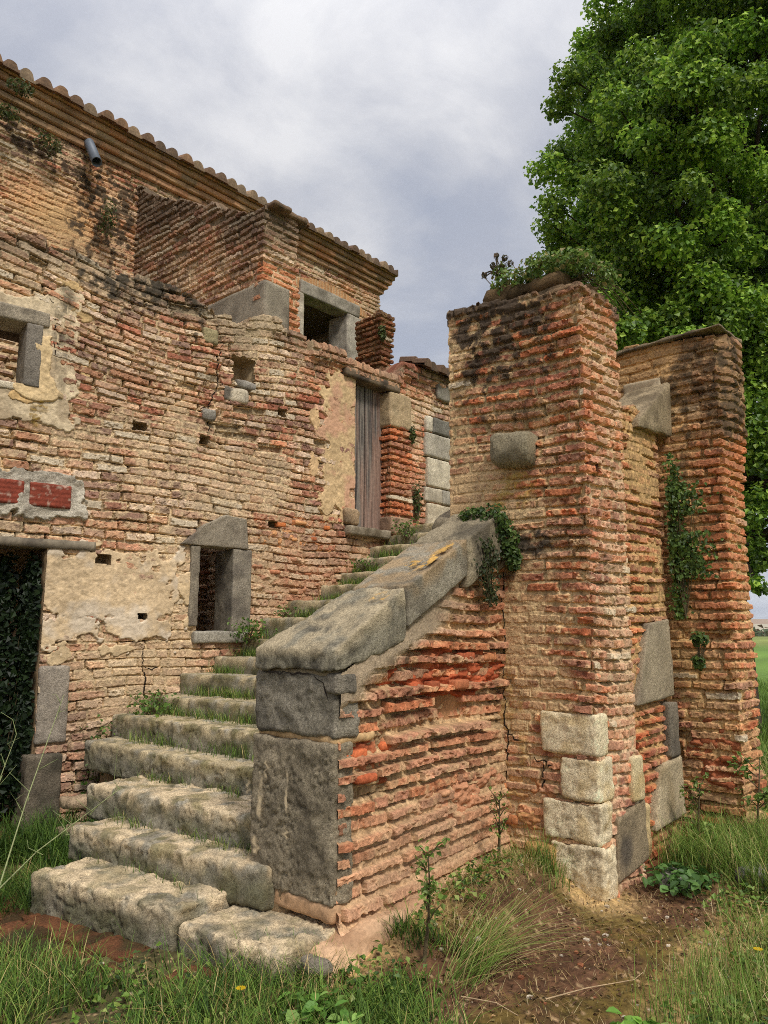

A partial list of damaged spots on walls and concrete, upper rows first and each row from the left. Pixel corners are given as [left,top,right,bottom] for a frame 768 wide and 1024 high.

peeling [0,278,97,433]
leakage [461,337,481,380]
peeling [251,363,356,604]
peeling [39,539,193,666]
crack [141,648,158,699]
crack [501,573,552,787]